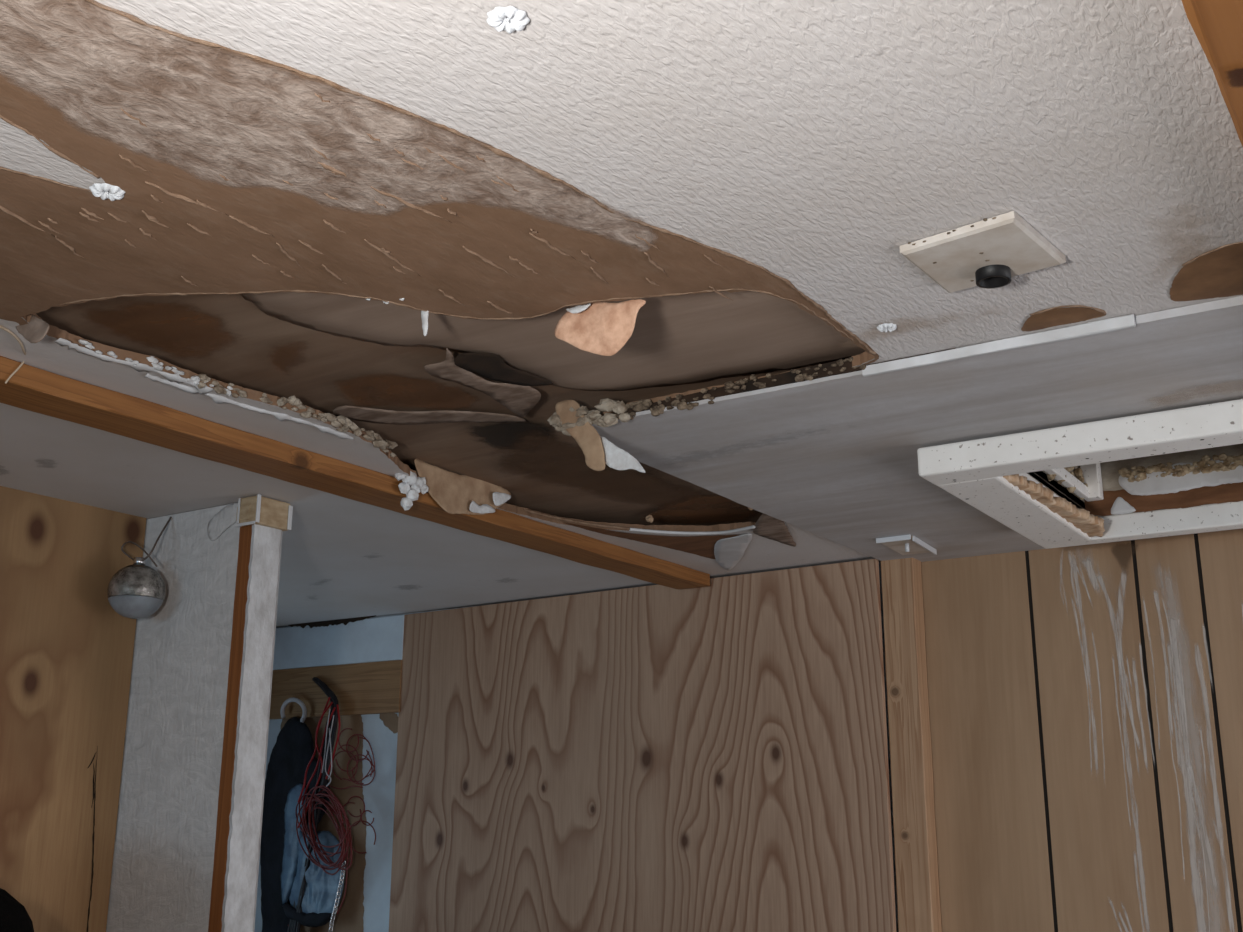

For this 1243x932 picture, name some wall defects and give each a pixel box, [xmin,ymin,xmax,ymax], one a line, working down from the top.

peeling [0,0,879,386]
peeling [1021,305,1106,331]
peeling [1169,242,1243,301]
spalling [78,340,398,457]
spalling [547,373,777,436]
water stain [1061,555,1234,932]